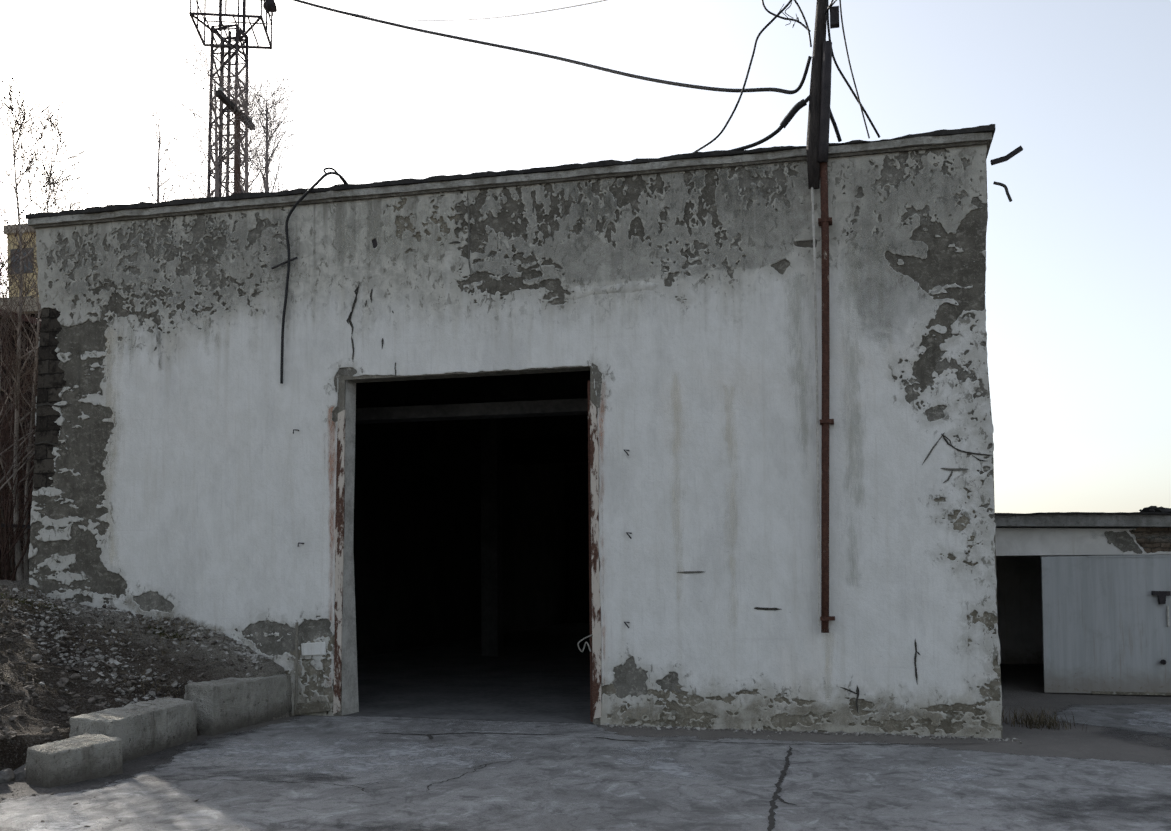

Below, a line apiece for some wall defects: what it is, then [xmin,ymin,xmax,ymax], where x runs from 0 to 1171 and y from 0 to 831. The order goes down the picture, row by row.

crack [346,283,396,376]
peeling [383,161,806,305]
peeling [794,239,817,248]
peeling [842,149,990,422]
peeling [29,207,286,613]
peeling [934,435,995,566]
flaking render [1104,527,1171,554]
peeling [234,616,335,714]
flaking render [602,656,835,732]
crack [840,686,859,712]
flaking render [846,610,1003,735]
crack [596,737,795,831]